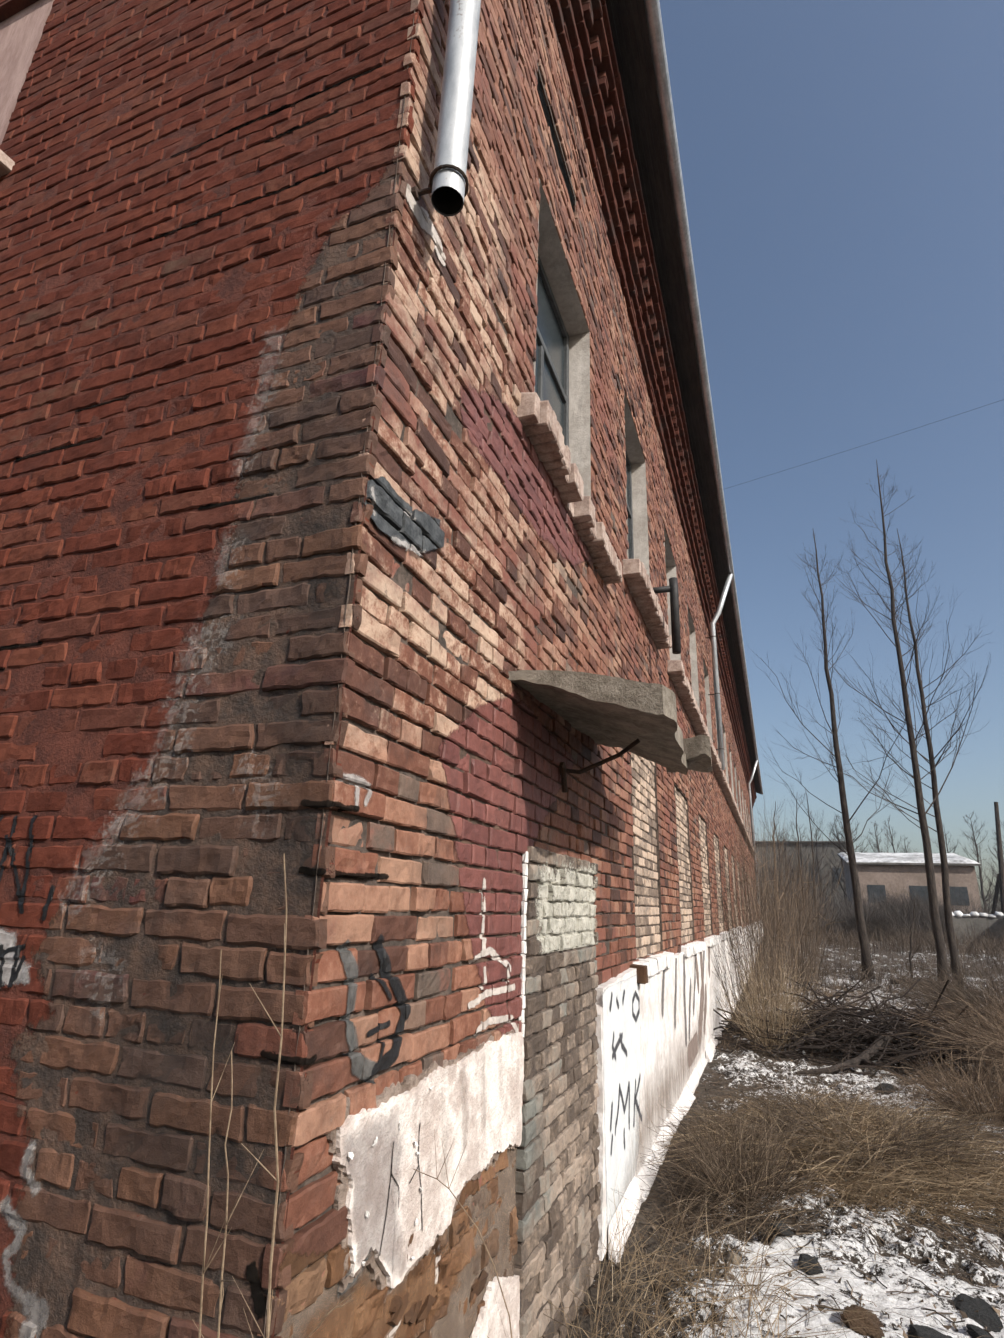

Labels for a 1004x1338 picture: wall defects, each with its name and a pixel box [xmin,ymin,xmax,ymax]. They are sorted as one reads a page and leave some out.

peeling [4,148,524,1338]